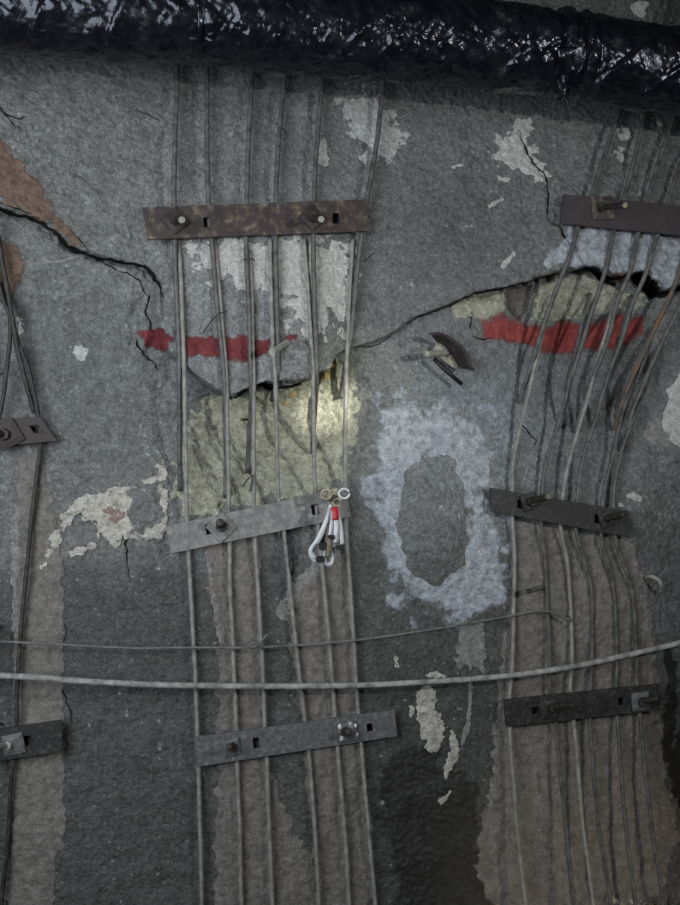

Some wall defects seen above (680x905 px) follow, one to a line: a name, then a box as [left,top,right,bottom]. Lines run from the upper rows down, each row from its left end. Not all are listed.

rust [0,141,89,251]
crack [519,130,679,299]
rust [0,241,24,302]
crack [0,202,164,370]
crack [352,276,553,347]
spalling [170,359,362,516]
spalling [643,372,680,448]
leakage [205,387,680,905]
peeling [409,671,460,779]